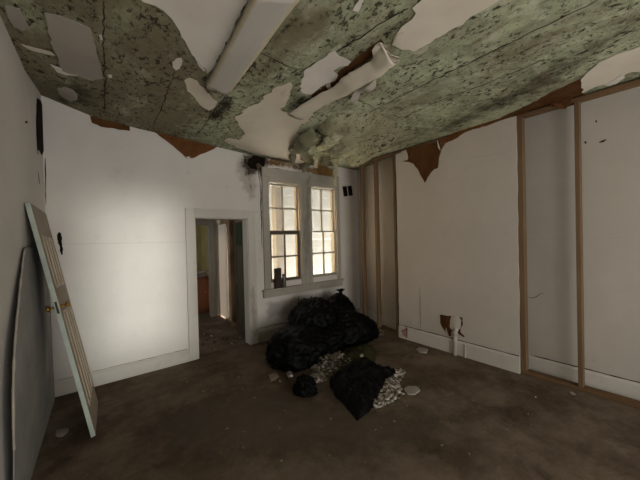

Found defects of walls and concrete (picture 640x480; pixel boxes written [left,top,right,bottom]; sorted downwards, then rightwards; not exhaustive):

peeling [21,12,112,81]
crack [100,1,108,110]
peeling [141,0,247,73]
spalling [36,98,44,155]
spalling [90,116,130,131]
spalling [157,133,216,161]
peeling [184,78,217,110]
mould [210,97,237,120]
peeling [224,0,499,186]
mould [449,60,579,126]
peeling [401,46,640,182]
spalling [440,315,465,337]